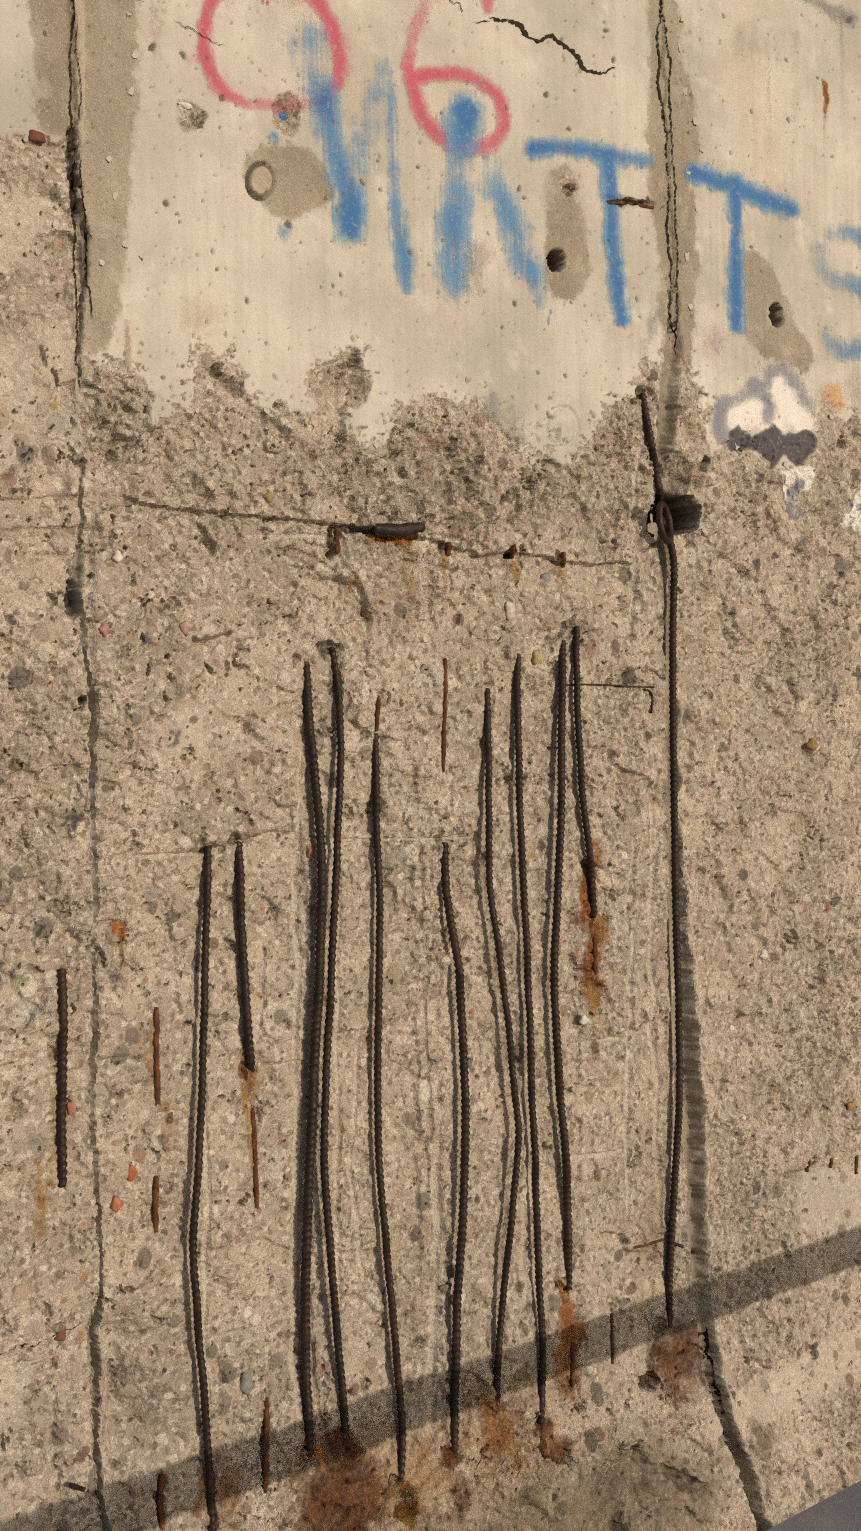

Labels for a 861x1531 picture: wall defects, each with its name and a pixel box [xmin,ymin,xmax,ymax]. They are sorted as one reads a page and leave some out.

crack [450,0,616,75]
crack [69,0,93,392]
spalling [558,175,579,200]
spalling [613,192,650,209]
crack [656,0,679,355]
spalling [0,133,103,1531]
spalling [77,347,861,1531]
corrosion [571,841,607,1010]
corrosion [552,1277,586,1397]
corrosion [639,1322,701,1400]
crack [703,1327,747,1463]
corrosion [303,1426,472,1531]